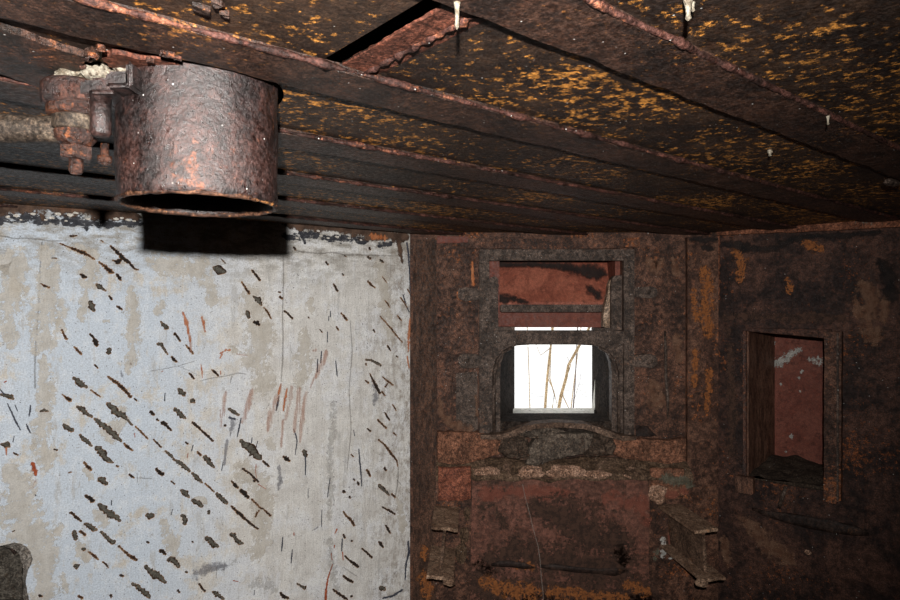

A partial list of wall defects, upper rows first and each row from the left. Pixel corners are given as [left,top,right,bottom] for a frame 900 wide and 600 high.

corrosion [0,77,39,88]
corrosion [73,0,900,235]
corrosion [0,164,115,180]
corrosion [690,265,715,340]
corrosion [730,249,749,283]
peeling [0,211,291,600]
corrosion [672,334,714,413]
corrosion [417,491,669,600]